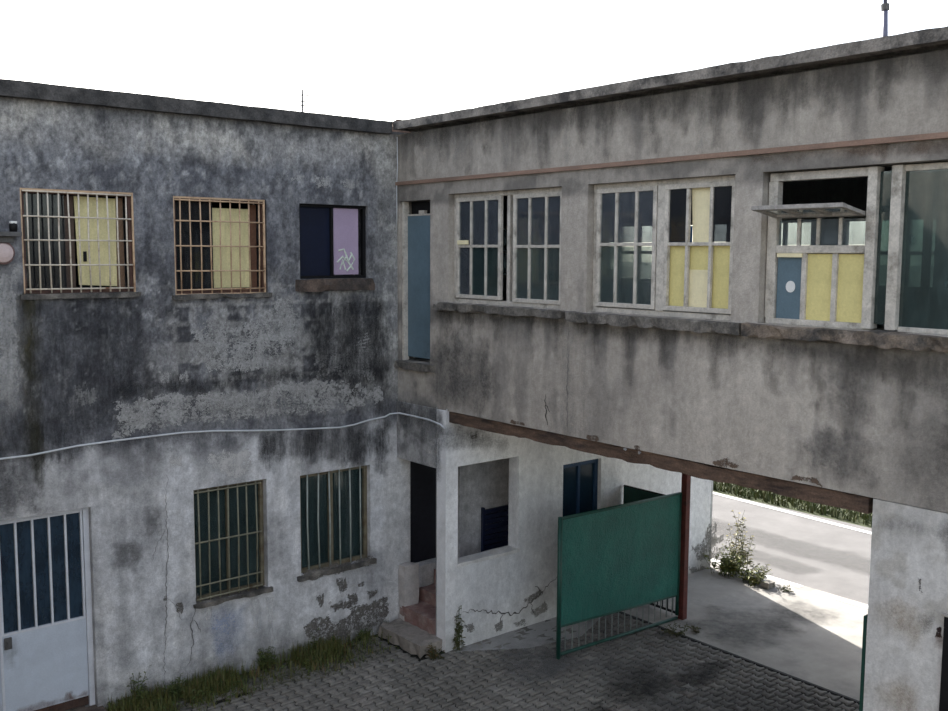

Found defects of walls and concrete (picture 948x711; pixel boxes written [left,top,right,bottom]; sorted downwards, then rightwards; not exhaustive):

water stain [0,269,65,480]
peeling [191,294,300,377]
peeling [112,333,385,443]
crack [153,477,201,685]
flaking render [303,556,391,644]
crack [467,577,557,629]